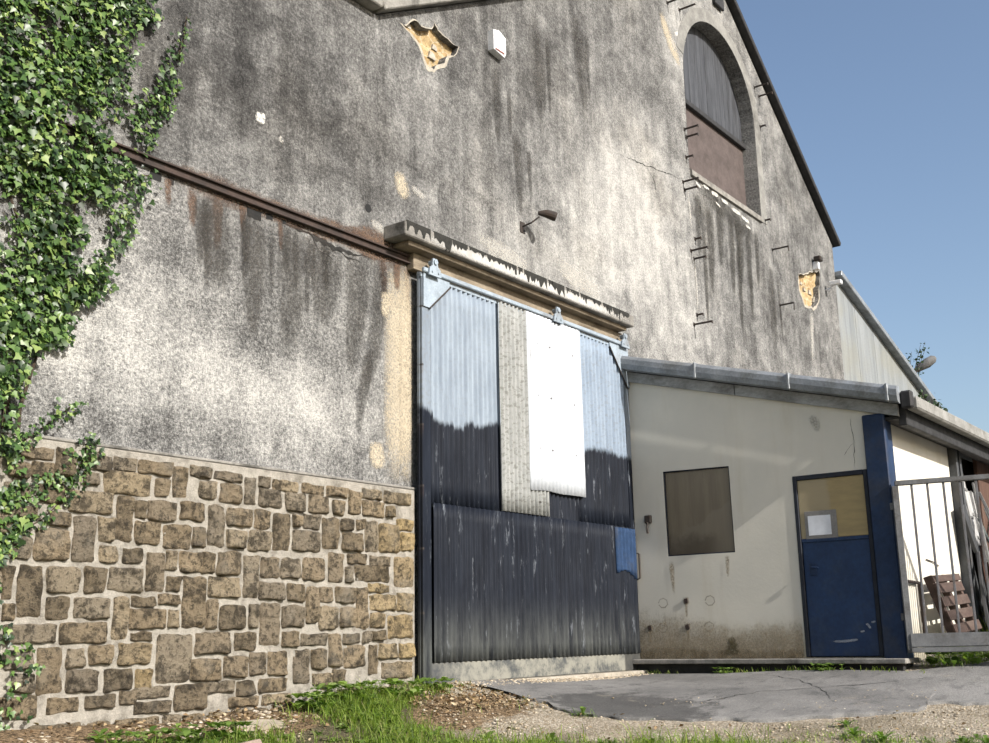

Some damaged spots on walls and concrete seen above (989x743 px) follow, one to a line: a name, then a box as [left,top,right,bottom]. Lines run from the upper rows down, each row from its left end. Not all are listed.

flaking render [401,19,459,72]
damp [243,222,334,329]
rust [188,173,410,302]
crack [273,218,375,262]
peeling [406,220,629,319]
damp [688,189,759,325]
flaking render [798,271,820,311]
flaking render [370,276,412,468]
damp [640,620,805,659]